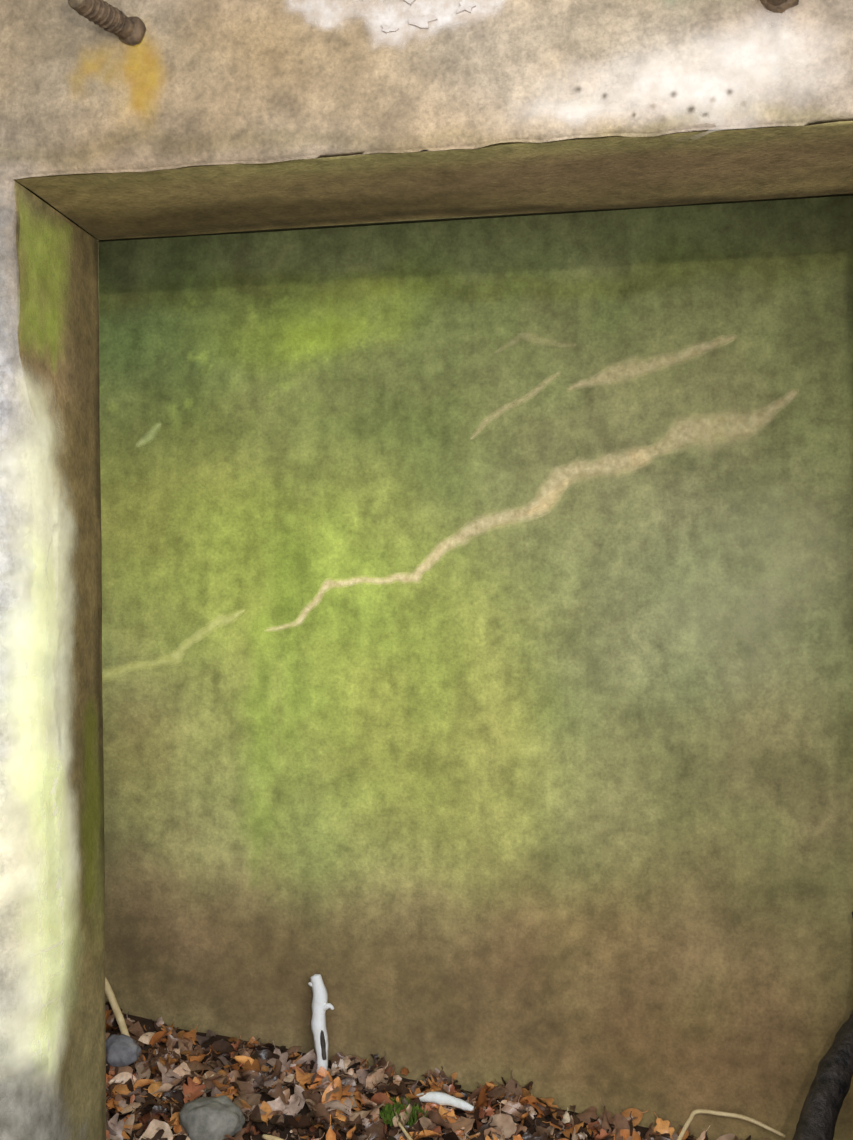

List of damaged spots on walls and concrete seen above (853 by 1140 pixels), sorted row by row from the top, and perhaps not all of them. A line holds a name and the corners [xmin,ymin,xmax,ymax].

peeling [363,0,502,44]
crack [569,338,733,390]
crack [267,393,795,631]
crack [102,611,242,679]